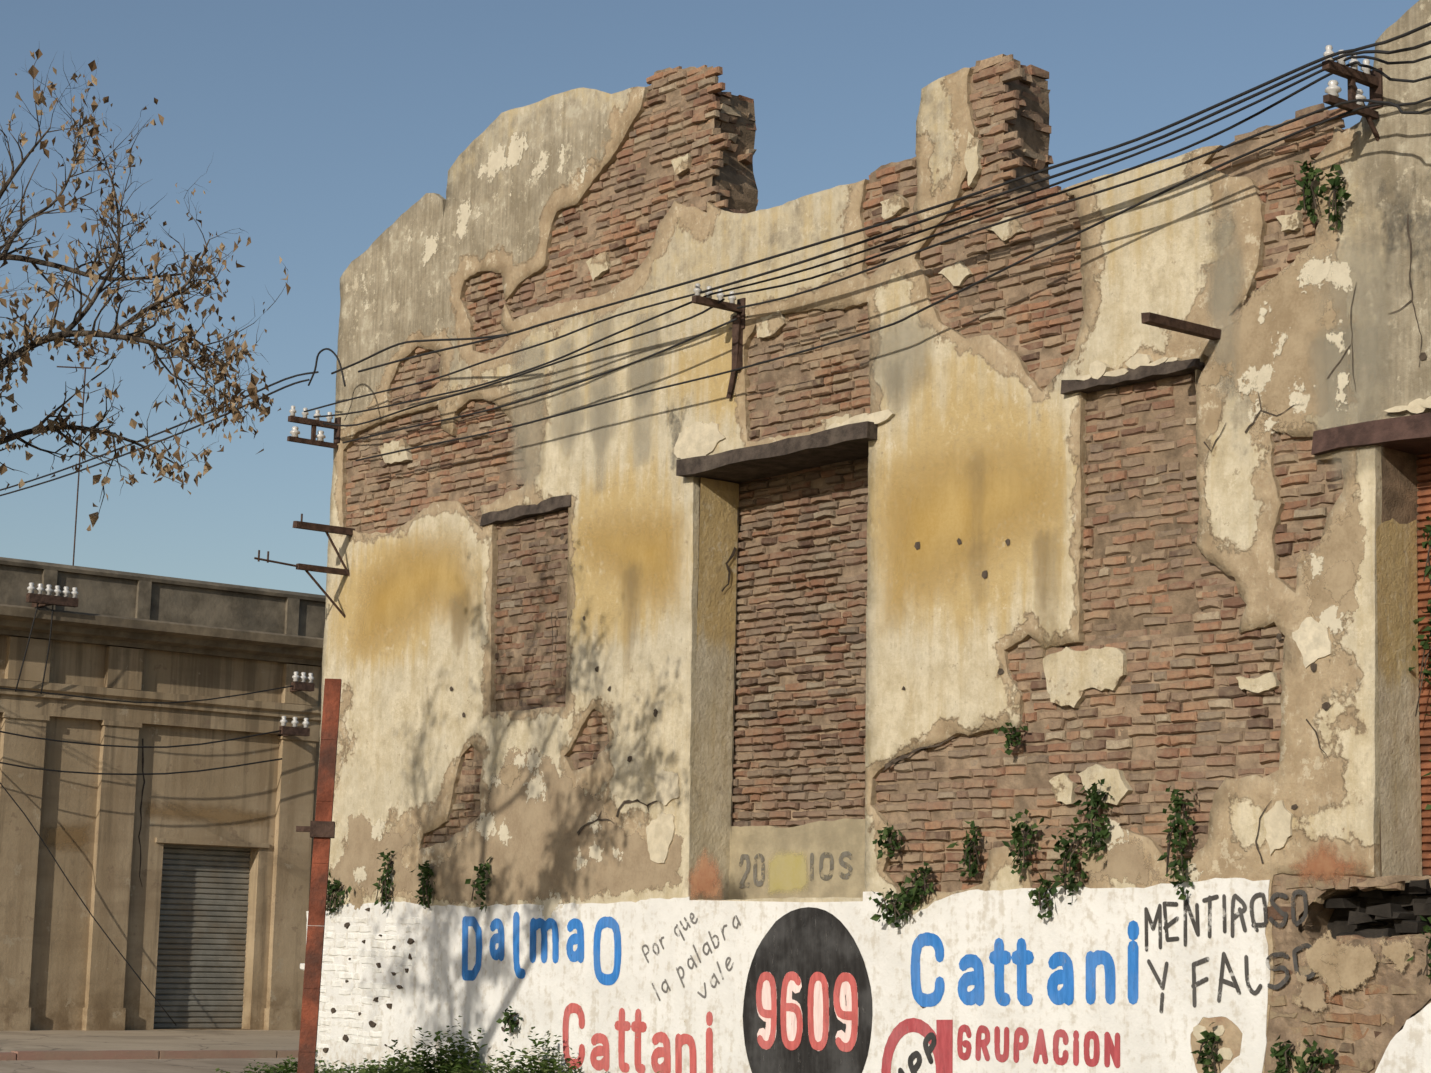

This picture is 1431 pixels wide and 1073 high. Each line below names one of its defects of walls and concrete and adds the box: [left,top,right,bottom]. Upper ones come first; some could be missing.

spalling [462,65,758,354]
spalling [863,54,1084,390]
leakage [362,547,468,637]
spalling [345,347,528,534]
peeling [330,711,684,929]
crack [883,736,955,771]
leakage [893,466,1039,602]
spalling [875,447,1285,892]
peeling [1199,103,1366,635]
spalling [362,934,415,1008]
peeling [1191,1017,1242,1073]
spalling [1264,873,1431,1073]